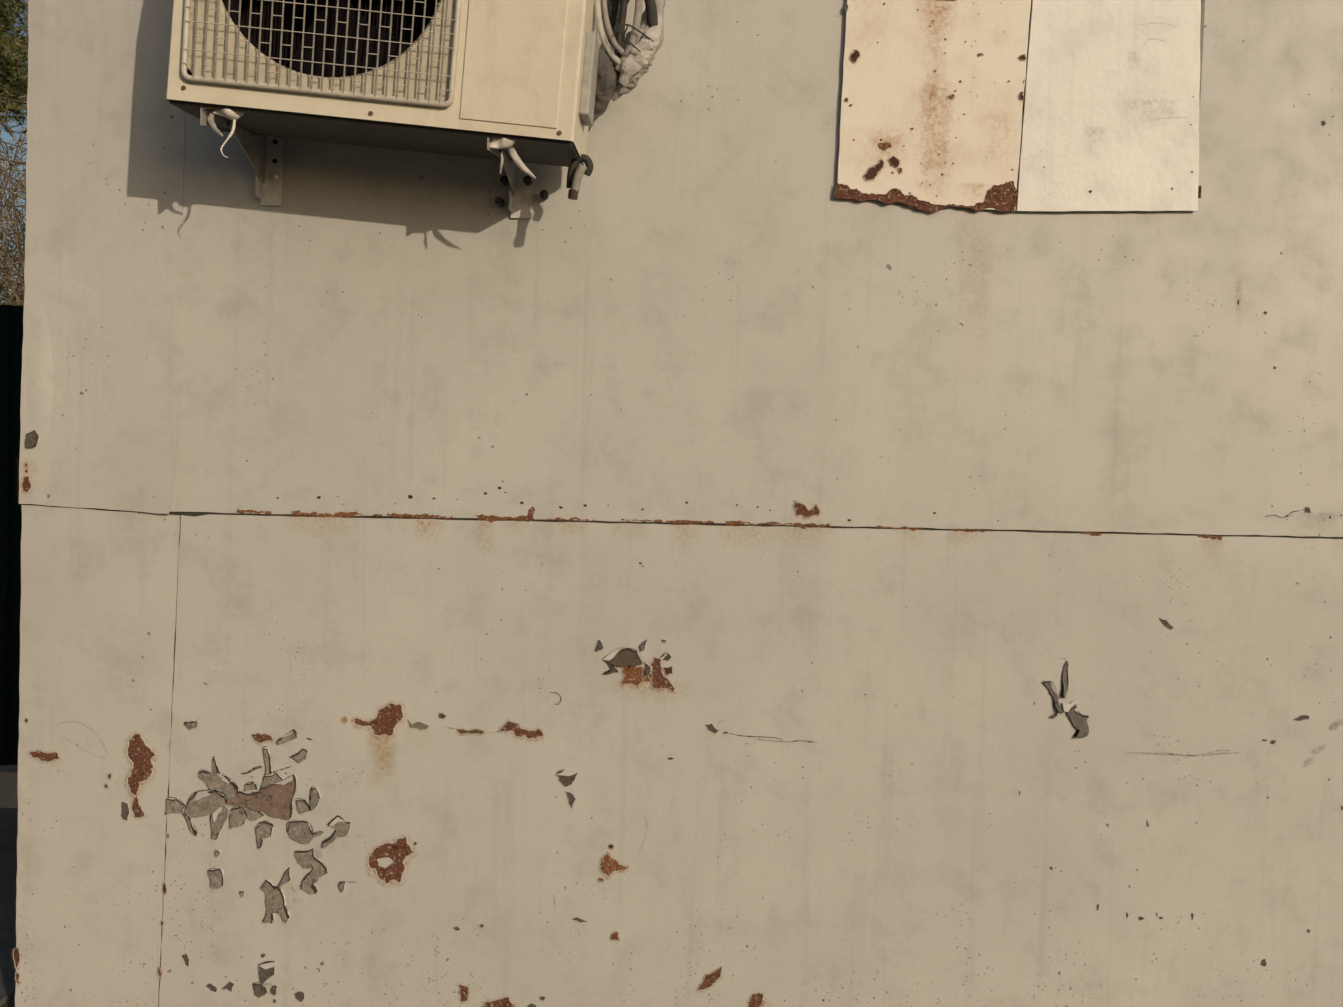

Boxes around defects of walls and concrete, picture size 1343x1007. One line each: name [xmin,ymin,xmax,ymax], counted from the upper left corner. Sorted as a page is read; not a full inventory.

corrosion [292,495,452,521]
corrosion [477,501,595,523]
corrosion [621,500,830,529]
peeling [595,638,675,693]
peeling [1041,661,1089,739]
corrosion [341,702,404,737]
corrosion [104,732,157,821]
peeling [165,729,351,924]
corrosion [367,836,418,885]
corrosion [598,844,629,882]
corrosion [458,984,517,1007]